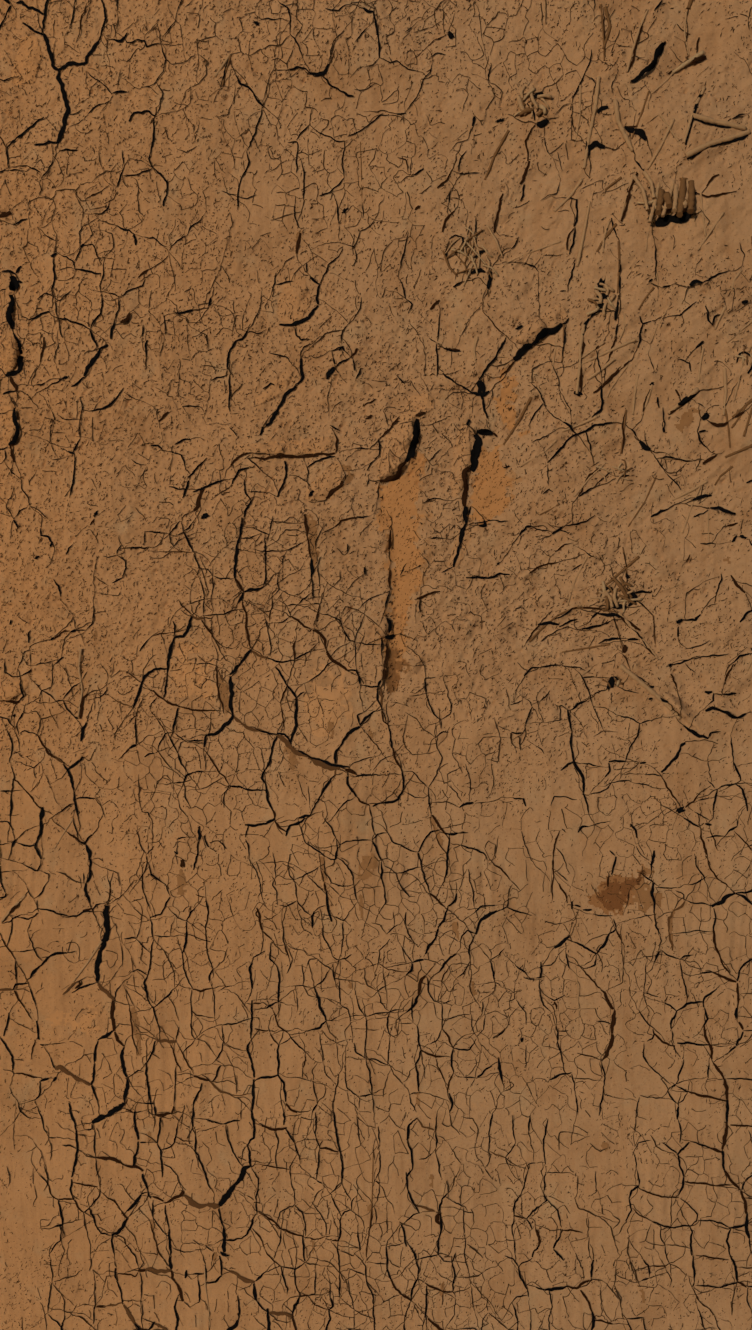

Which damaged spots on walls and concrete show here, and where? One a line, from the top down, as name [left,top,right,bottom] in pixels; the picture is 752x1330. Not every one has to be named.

crack [0,0,219,498]
crack [380,0,752,611]
crack [0,408,752,1330]